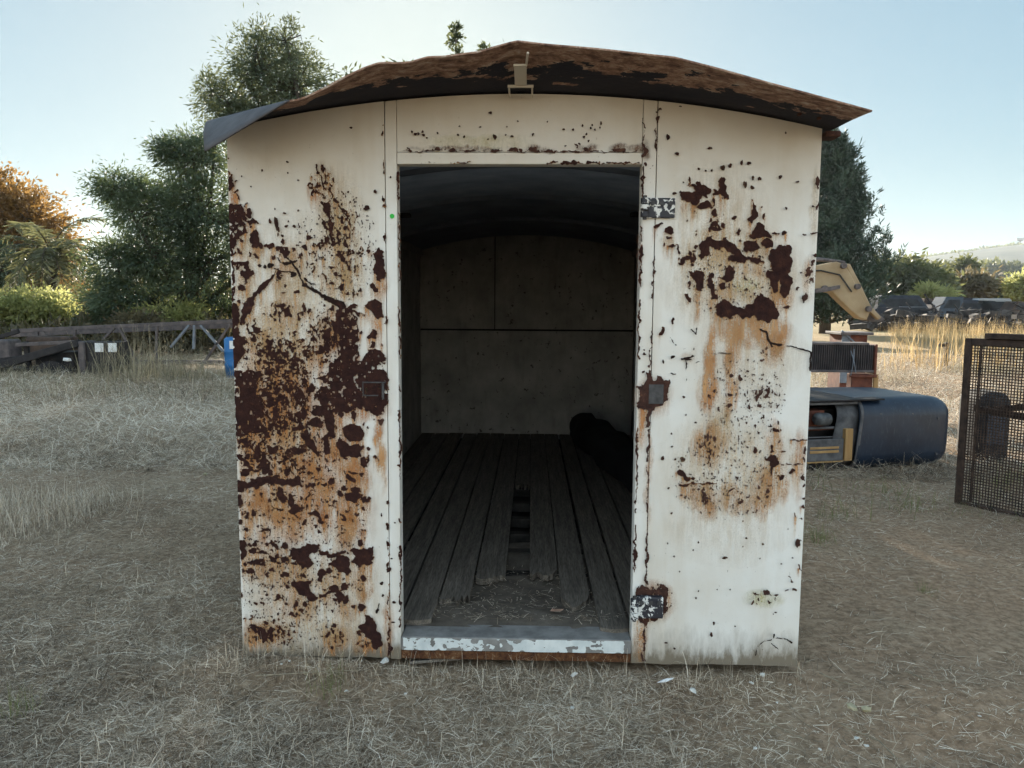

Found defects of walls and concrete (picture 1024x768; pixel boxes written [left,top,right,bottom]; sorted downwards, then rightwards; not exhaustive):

corrosion [403,108,670,198]
corrosion [228,158,816,662]
peeling [403,638,625,654]